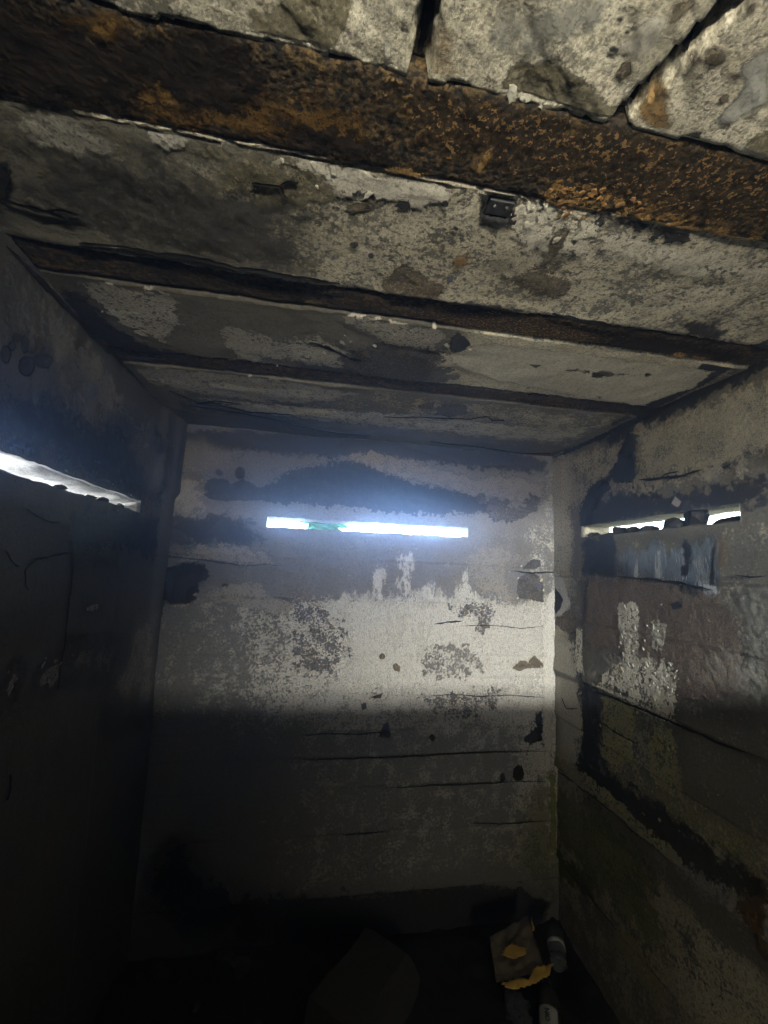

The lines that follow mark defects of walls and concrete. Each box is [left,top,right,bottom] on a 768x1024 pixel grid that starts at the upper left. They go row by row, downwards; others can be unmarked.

rust [131,80,368,157]
rust [367,74,768,237]
peeling [499,176,768,298]
peeling [77,281,186,344]
peeling [382,264,454,299]
peeling [132,311,602,441]
peeling [565,368,651,378]
peeling [174,472,208,518]
leakage [162,561,210,615]
peeling [263,593,355,678]
peeling [418,599,508,720]
flaking render [513,534,747,724]